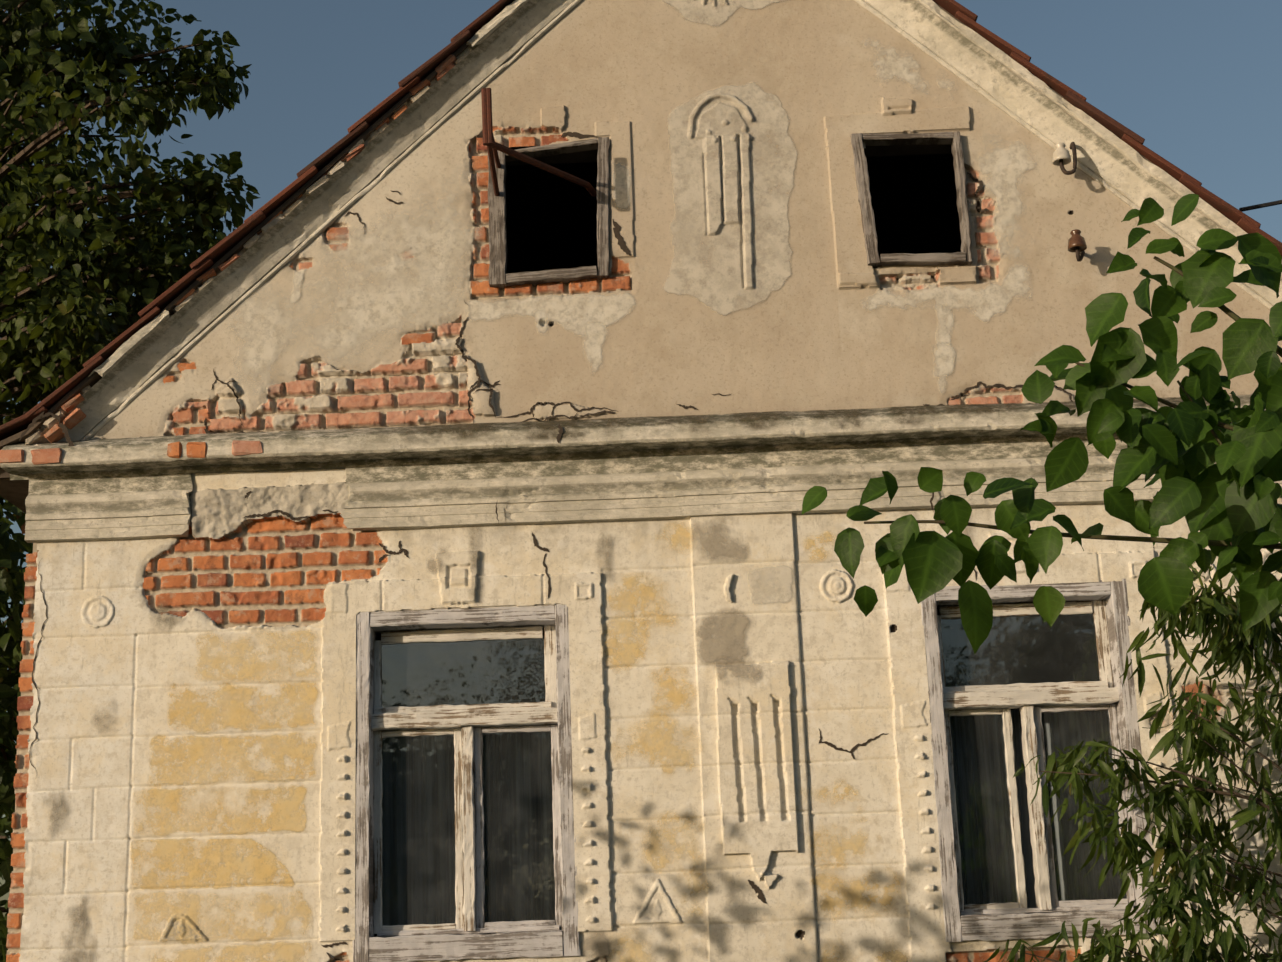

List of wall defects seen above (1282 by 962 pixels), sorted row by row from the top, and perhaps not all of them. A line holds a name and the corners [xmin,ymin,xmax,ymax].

spalling [289,257,314,271]
spalling [323,222,349,251]
spalling [467,125,632,300]
spalling [964,163,1001,284]
spalling [163,314,476,436]
spalling [948,386,1024,405]
crack [532,532,551,598]
spalling [6,550,39,962]
spalling [132,482,388,962]
crack [819,729,889,759]